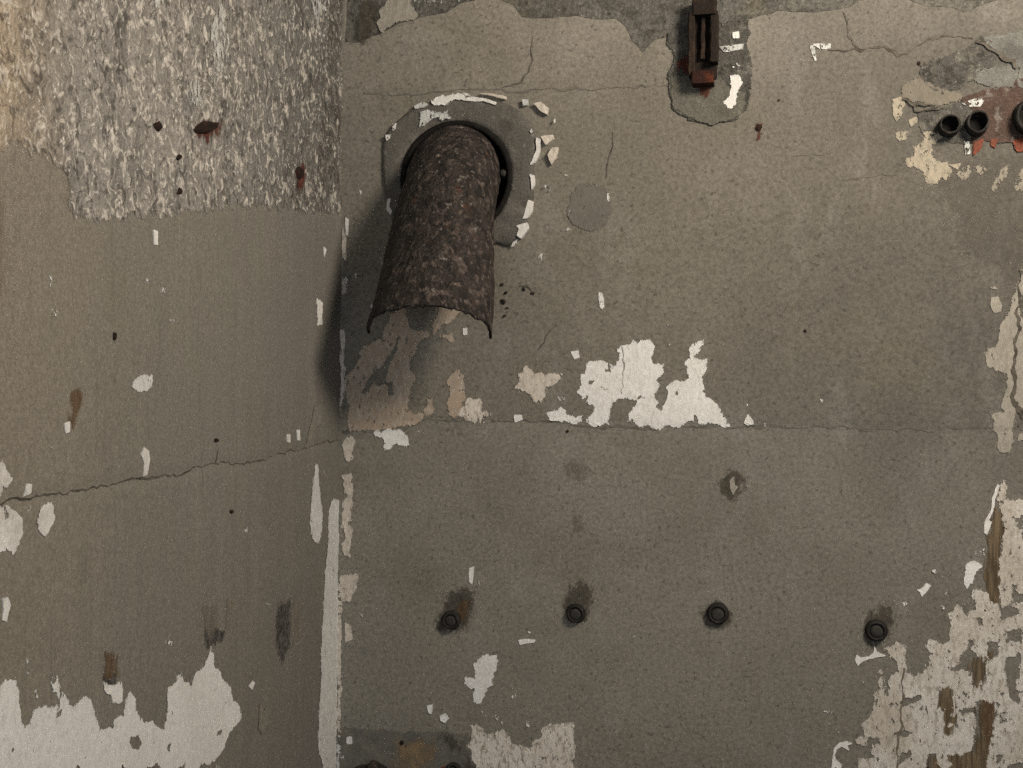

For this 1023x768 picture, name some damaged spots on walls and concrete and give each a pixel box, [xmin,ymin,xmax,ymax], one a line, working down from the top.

flaking render [0,0,474,261]
crack [363,37,669,96]
crack [605,132,613,178]
crack [829,12,973,57]
spalling [892,31,1023,184]
crack [0,269,1023,505]
peeling [515,339,730,430]
peeling [984,262,1023,453]
peeling [309,307,468,768]
peeling [0,597,242,768]
peeling [464,654,577,768]
peeling [828,481,1023,768]